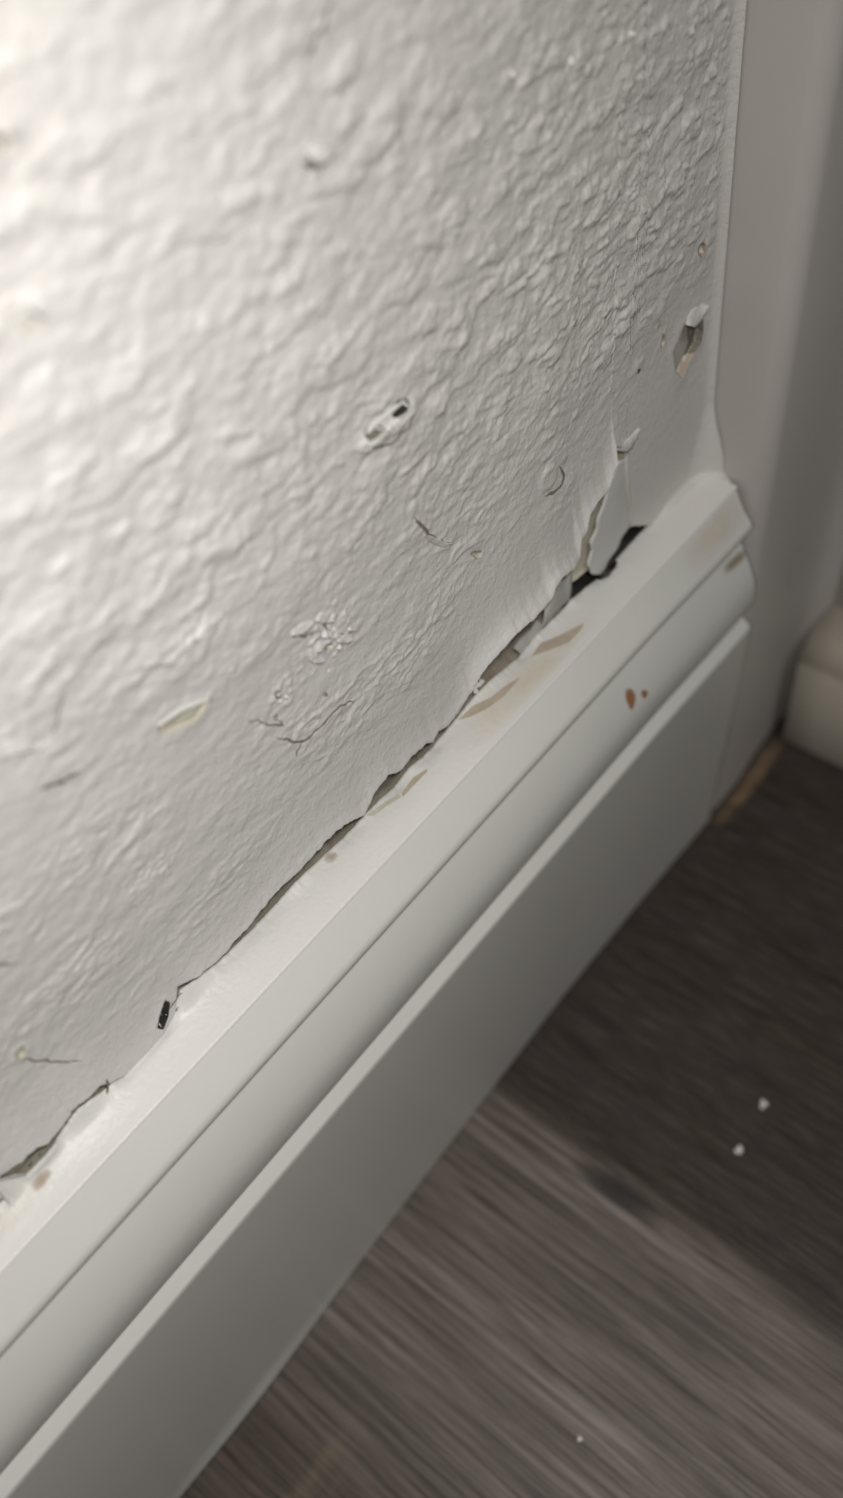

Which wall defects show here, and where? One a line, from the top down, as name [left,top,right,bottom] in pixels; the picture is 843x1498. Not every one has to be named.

spalling [684,304,709,355]
peeling [360,399,418,454]
spalling [290,611,357,675]
peeling [532,624,584,656]
peeling [156,698,211,735]
crack [158,428,642,1029]
peeling [458,677,520,720]
crack [40,770,80,790]
peeling [367,769,427,816]
crack [0,1058,118,1202]